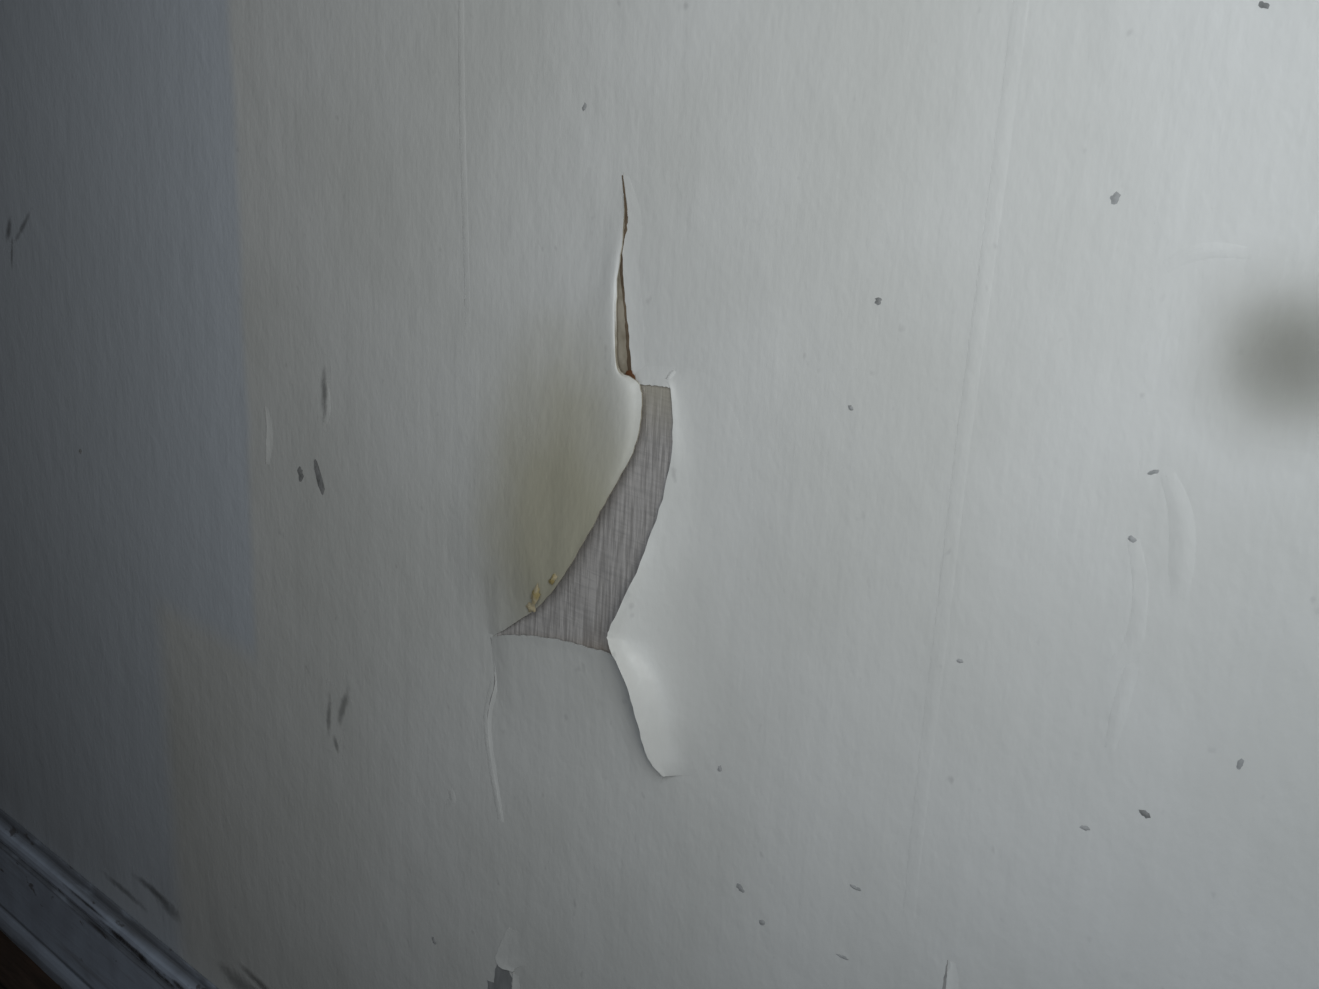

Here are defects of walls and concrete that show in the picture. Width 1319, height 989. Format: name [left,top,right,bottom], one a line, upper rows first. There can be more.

peeling [447,166,753,792]
crack [483,638,504,822]
spalling [487,927,528,989]
crack [942,960,959,989]